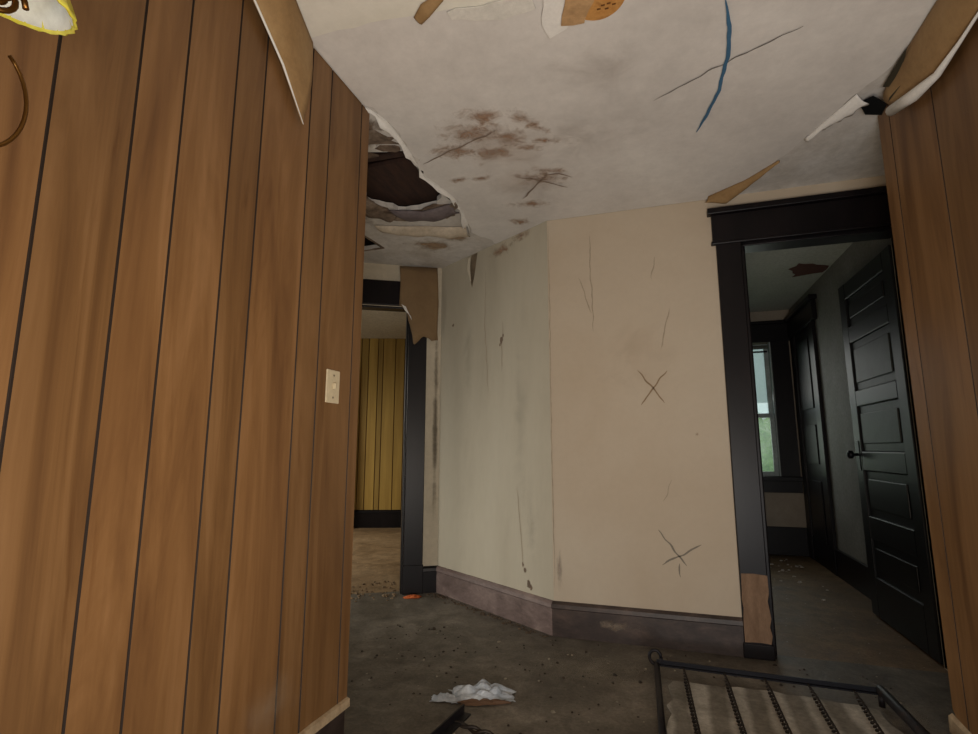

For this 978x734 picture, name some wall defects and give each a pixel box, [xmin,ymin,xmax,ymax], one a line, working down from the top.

flaking render [368,129,401,158]
damp [441,113,493,156]
damp [420,237,465,250]